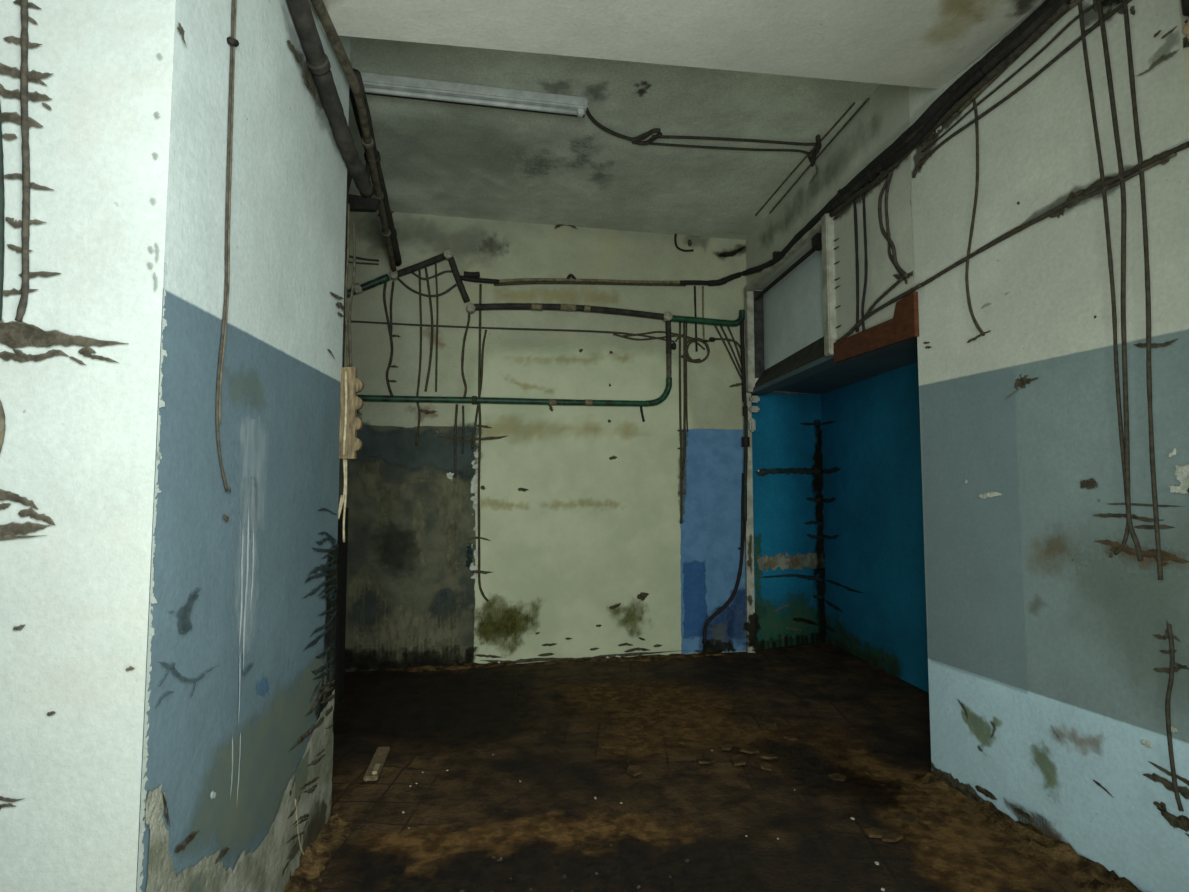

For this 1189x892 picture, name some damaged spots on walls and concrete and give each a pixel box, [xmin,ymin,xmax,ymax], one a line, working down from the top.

water stain [1016,0,1033,15]
spalling [1169,448,1189,494]
peeling [126,263,339,892]
spalling [757,552,825,578]
water stain [239,513,254,711]
water stain [612,605,642,635]
water stain [189,658,330,851]
spalling [1153,801,1189,837]